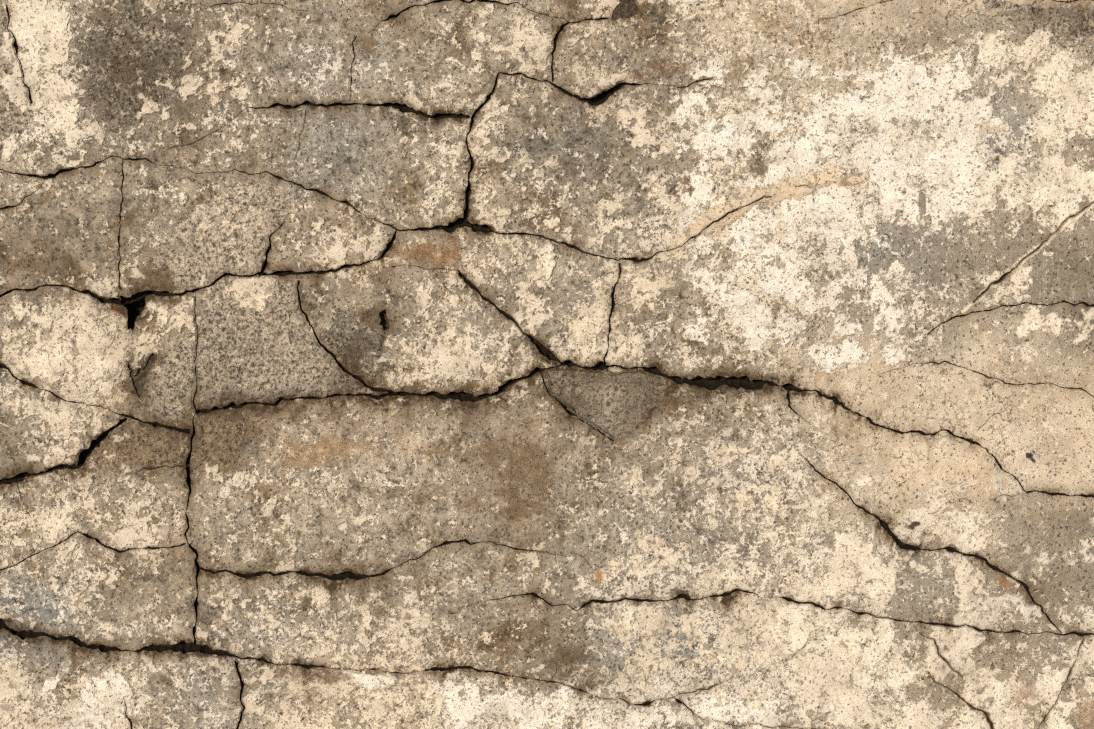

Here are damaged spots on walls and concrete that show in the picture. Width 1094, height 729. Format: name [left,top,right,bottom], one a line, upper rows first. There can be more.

crack [6,5,32,104]
crack [349,36,357,98]
crack [367,0,451,34]
crack [460,0,608,82]
crack [656,78,713,88]
crack [687,196,769,242]
crack [927,202,1094,335]
crack [0,72,682,669]
crack [561,263,1094,498]
crack [451,449,1094,729]
crack [234,660,245,729]
crack [349,666,659,706]